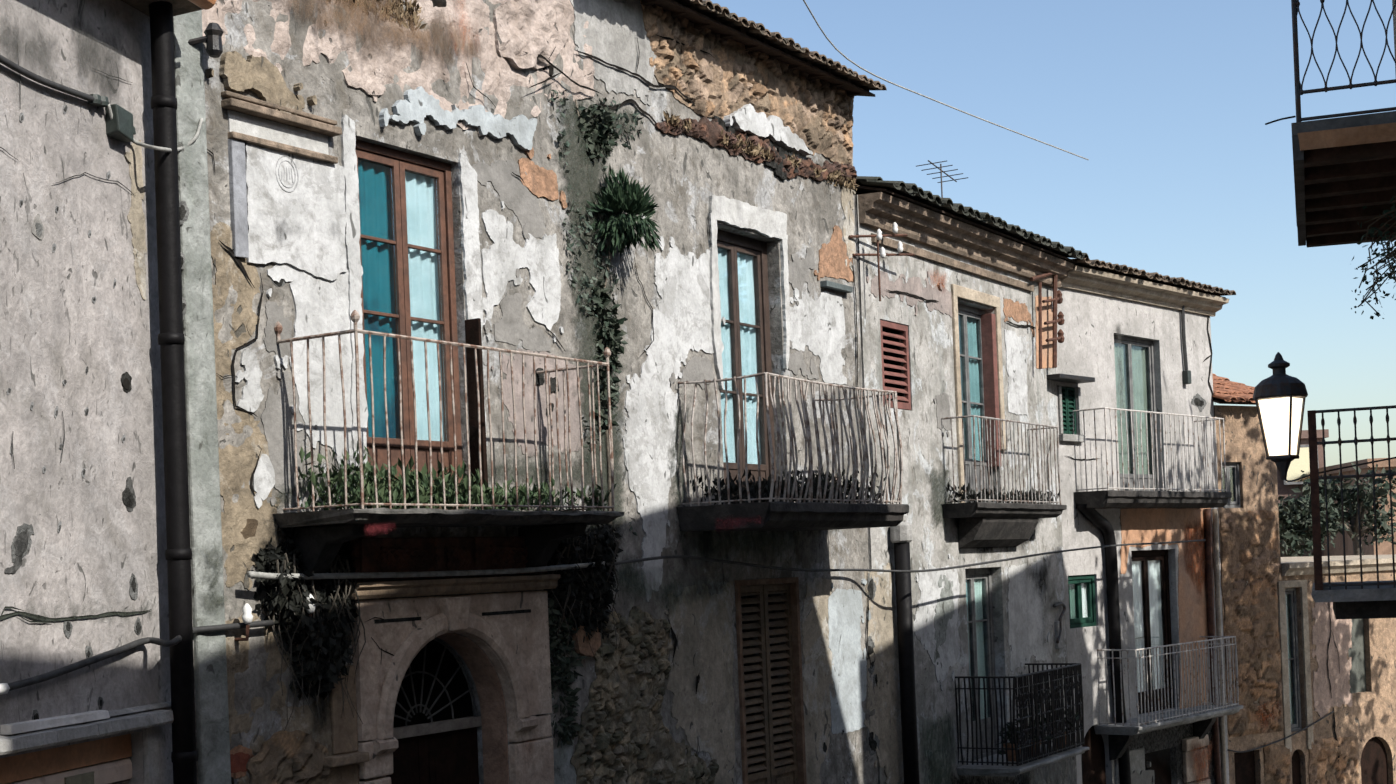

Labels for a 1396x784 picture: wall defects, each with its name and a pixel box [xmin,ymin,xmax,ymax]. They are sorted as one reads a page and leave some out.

flaking render [202,0,656,209]
crack [523,35,826,188]
spalling [655,104,857,194]
flaking render [235,263,363,473]
flaking render [782,225,869,385]
spalling [4,523,35,574]
flaking render [240,454,277,539]
flaking render [622,236,736,784]
flaking render [571,625,601,657]
flaking render [802,571,880,784]